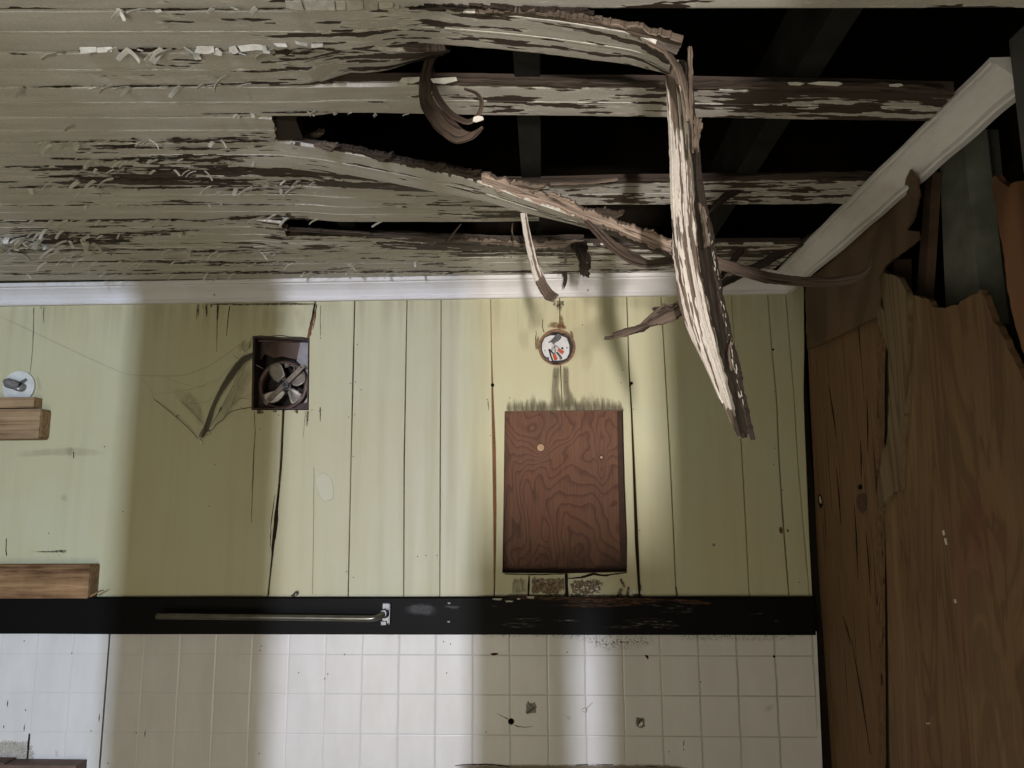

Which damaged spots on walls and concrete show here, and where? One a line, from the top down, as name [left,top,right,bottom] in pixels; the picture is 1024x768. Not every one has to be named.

peeling [111,0,399,21]
peeling [80,40,335,65]
peeling [39,75,271,99]
spalling [679,60,696,118]
peeling [207,111,316,119]
peeling [0,124,420,284]
spalling [691,148,755,440]
leakage [553,368,573,411]
crack [251,411,280,595]